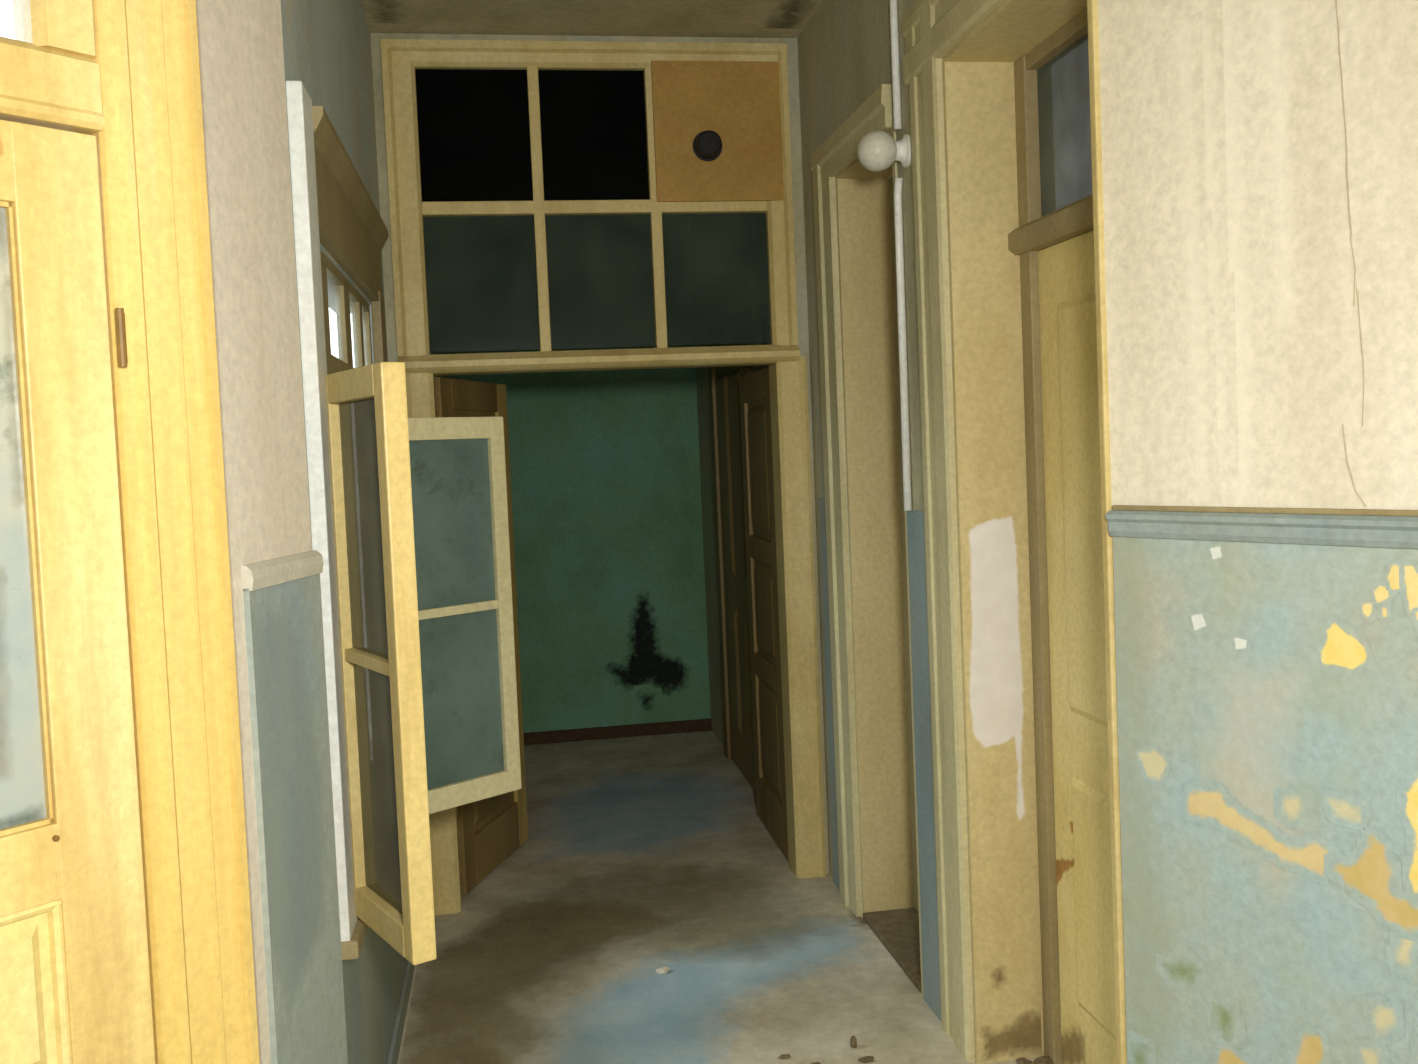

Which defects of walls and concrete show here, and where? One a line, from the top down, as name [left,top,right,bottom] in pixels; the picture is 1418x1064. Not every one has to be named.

damp [361,0,421,24]
damp [748,0,822,29]
peeling [1207,543,1226,563]
peeling [1188,610,1209,634]
peeling [1313,560,1418,677]
peeling [1230,634,1250,653]
peeling [1135,743,1418,980]
peeling [1209,1039,1257,1064]
peeling [1288,1024,1333,1064]